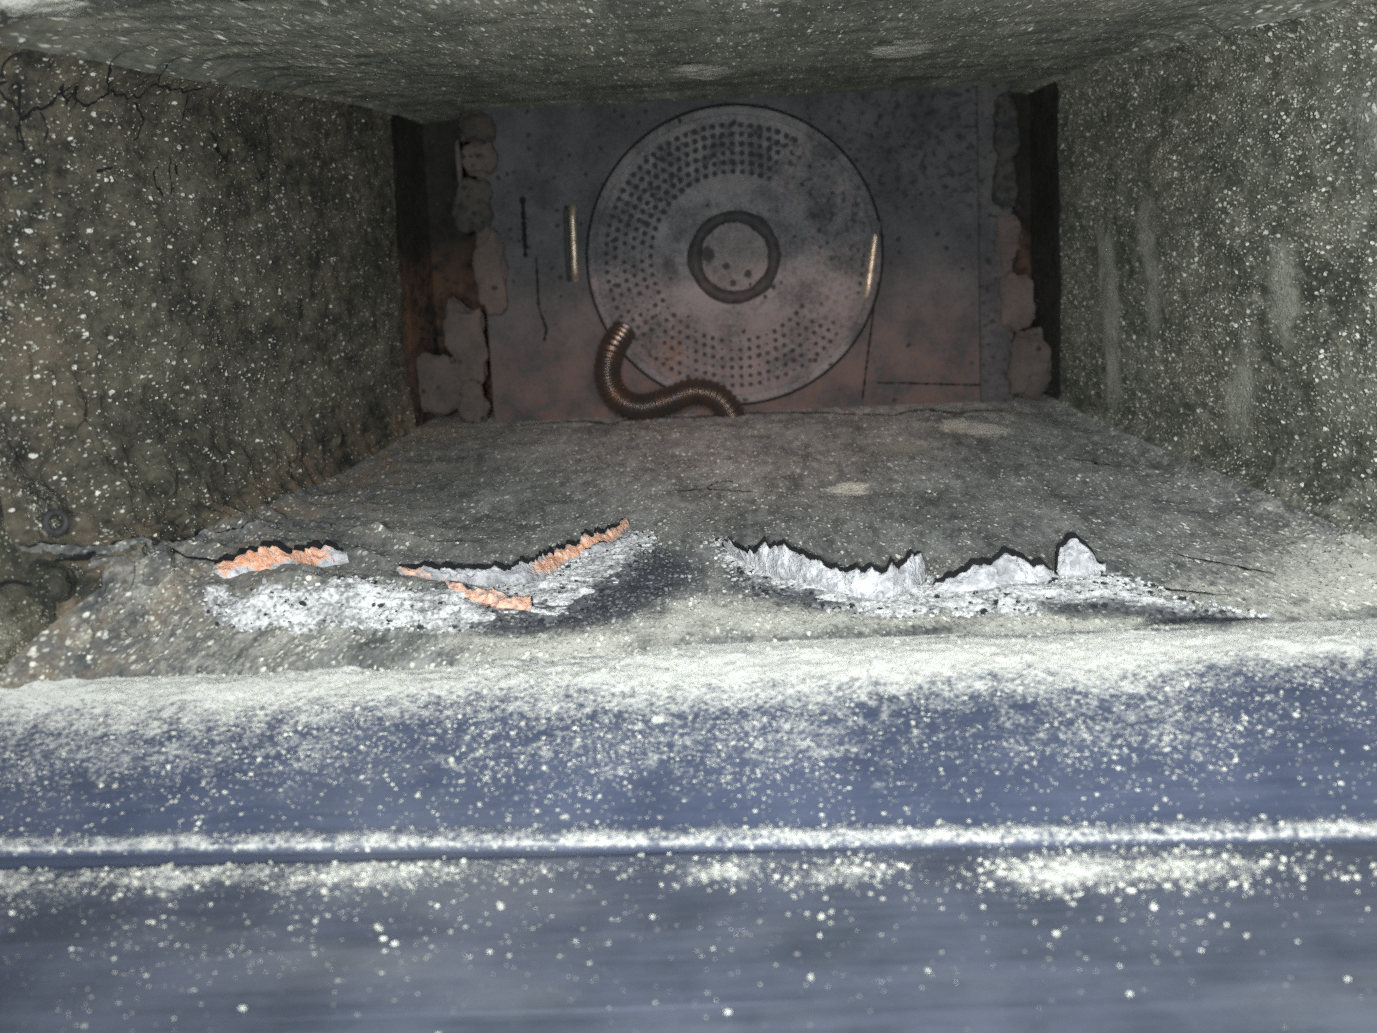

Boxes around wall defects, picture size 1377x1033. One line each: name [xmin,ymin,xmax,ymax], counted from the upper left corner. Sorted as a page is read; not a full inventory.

crack [0,52,270,196]
peeling [205,517,694,635]
peeling [709,532,1272,625]